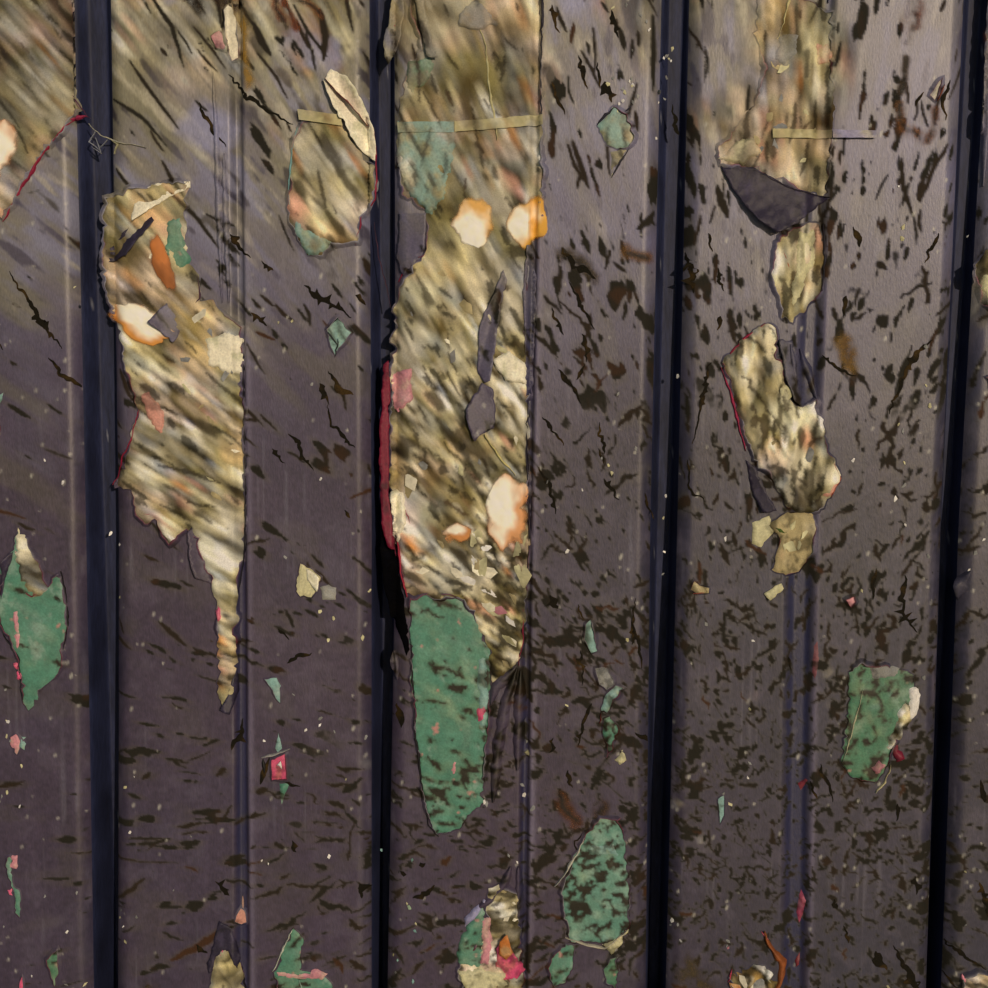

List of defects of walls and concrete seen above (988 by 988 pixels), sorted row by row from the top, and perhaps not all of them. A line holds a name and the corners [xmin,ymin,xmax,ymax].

peeling [0,0,89,223]
peeling [714,0,842,600]
peeling [972,248,988,311]
peeling [99,178,250,715]
peeling [285,0,549,837]
peeling [0,528,72,712]
peeling [839,658,925,793]
peeling [206,896,249,988]
peeling [272,927,334,988]
peeling [454,882,528,988]
peeling [545,815,633,988]
peeling [727,931,800,988]